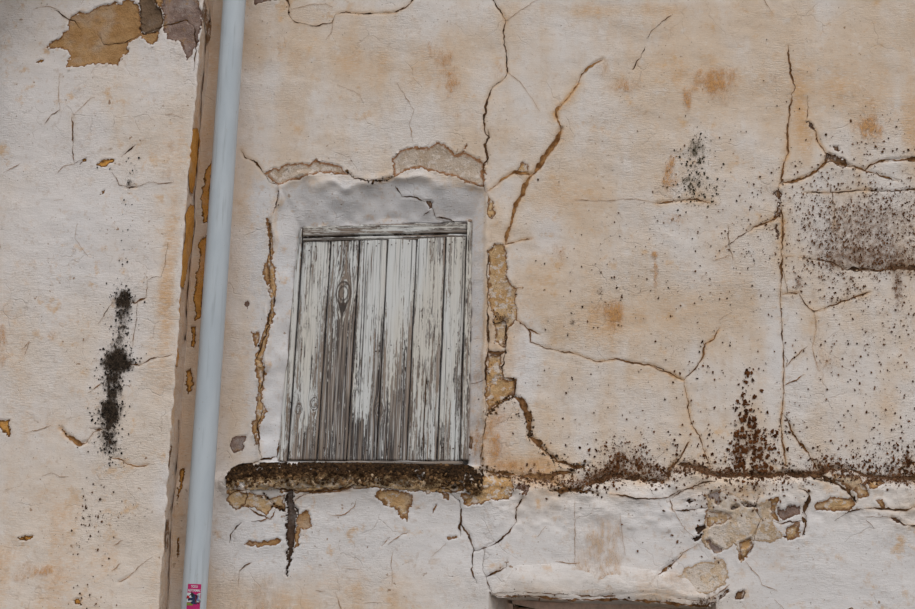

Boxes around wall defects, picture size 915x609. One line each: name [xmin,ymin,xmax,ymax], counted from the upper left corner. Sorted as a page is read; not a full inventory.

flaking render [46,0,212,70]
crack [345,169,454,222]
damp [87,278,147,471]
flaking render [230,218,277,453]
crack [241,151,280,463]
flaking render [484,243,518,411]
crack [434,0,915,609]
damp [469,95,915,532]
damp [71,477,122,555]
crack [229,483,367,540]
flaking render [226,474,529,577]
flaking render [677,490,801,600]